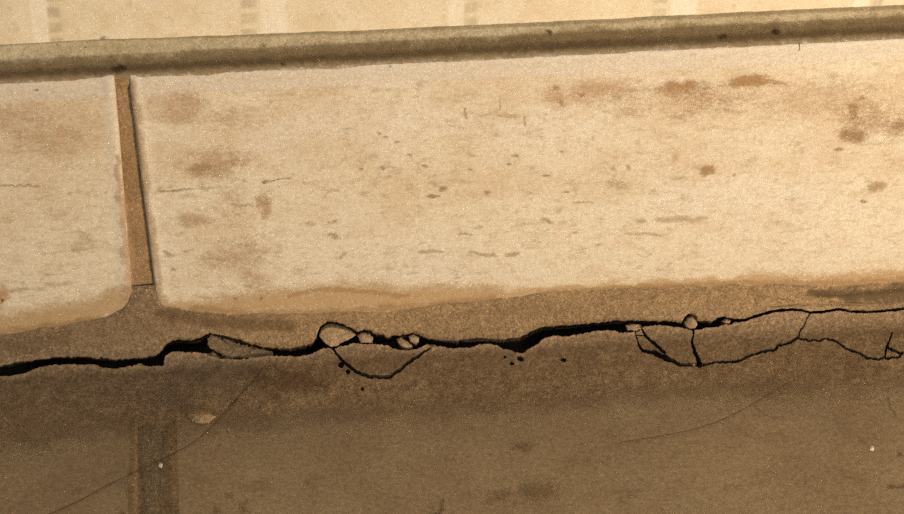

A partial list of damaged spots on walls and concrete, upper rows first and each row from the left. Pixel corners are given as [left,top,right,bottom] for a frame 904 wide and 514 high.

water stain [0,286,130,335]
water stain [162,279,538,315]
water stain [660,270,904,308]
crack [0,307,904,380]